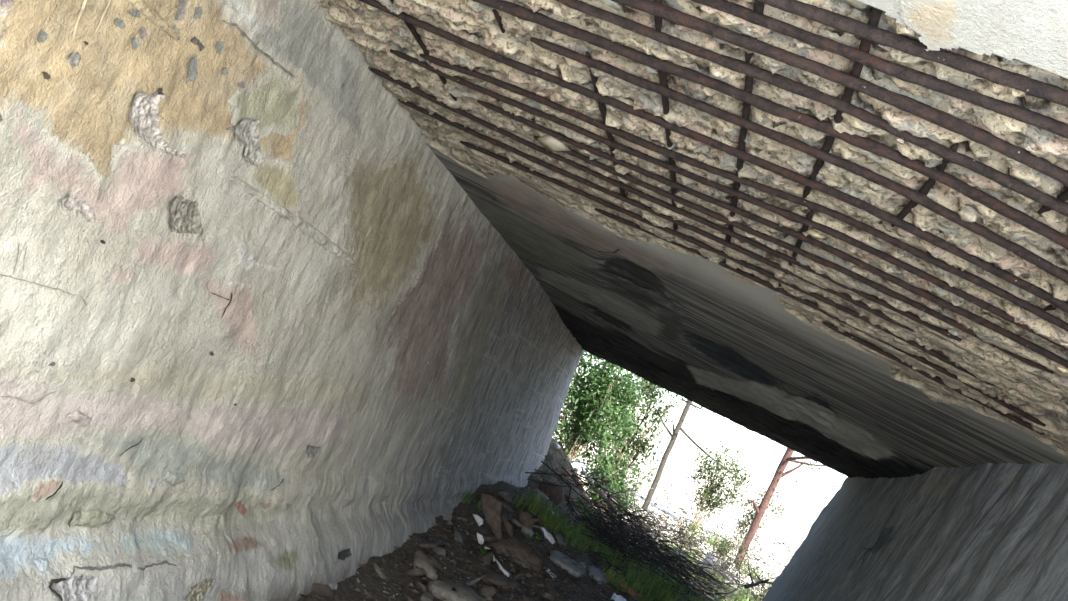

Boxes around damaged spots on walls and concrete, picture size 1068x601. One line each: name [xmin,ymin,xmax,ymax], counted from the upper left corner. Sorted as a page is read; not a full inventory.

spalling [129,87,186,158]
spalling [226,117,264,166]
spalling [168,194,203,234]
spalling [314,0,1068,458]
crack [0,244,87,307]
water stain [0,0,367,592]
water stain [324,121,693,425]
crack [49,560,179,601]